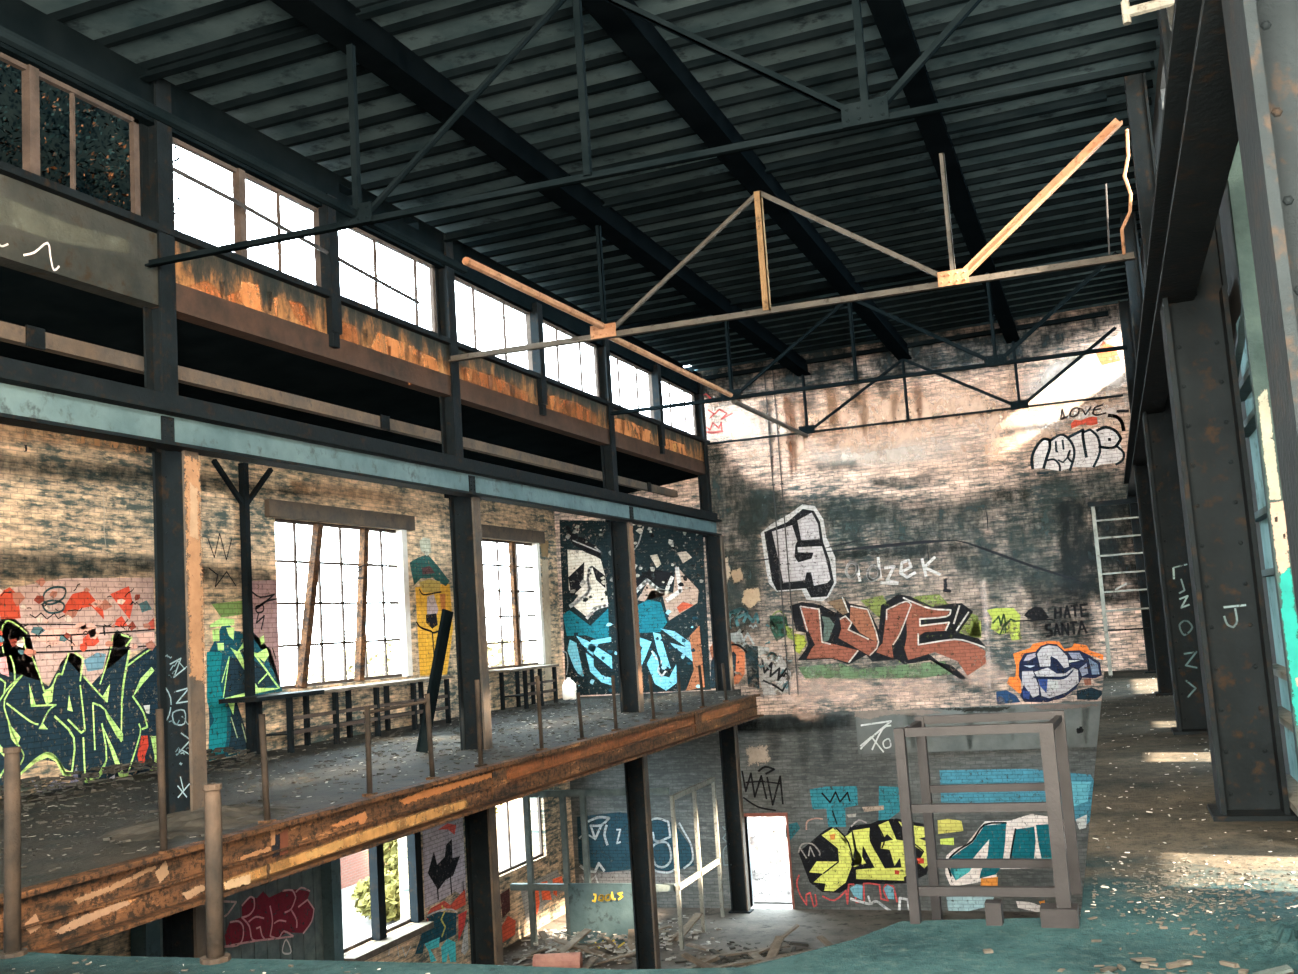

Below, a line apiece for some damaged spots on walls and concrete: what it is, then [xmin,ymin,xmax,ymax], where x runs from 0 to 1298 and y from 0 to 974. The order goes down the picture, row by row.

rust [189,281,317,330]
rust [340,322,439,372]
rust [461,366,528,401]
rust [546,395,596,424]
rust [614,418,687,456]